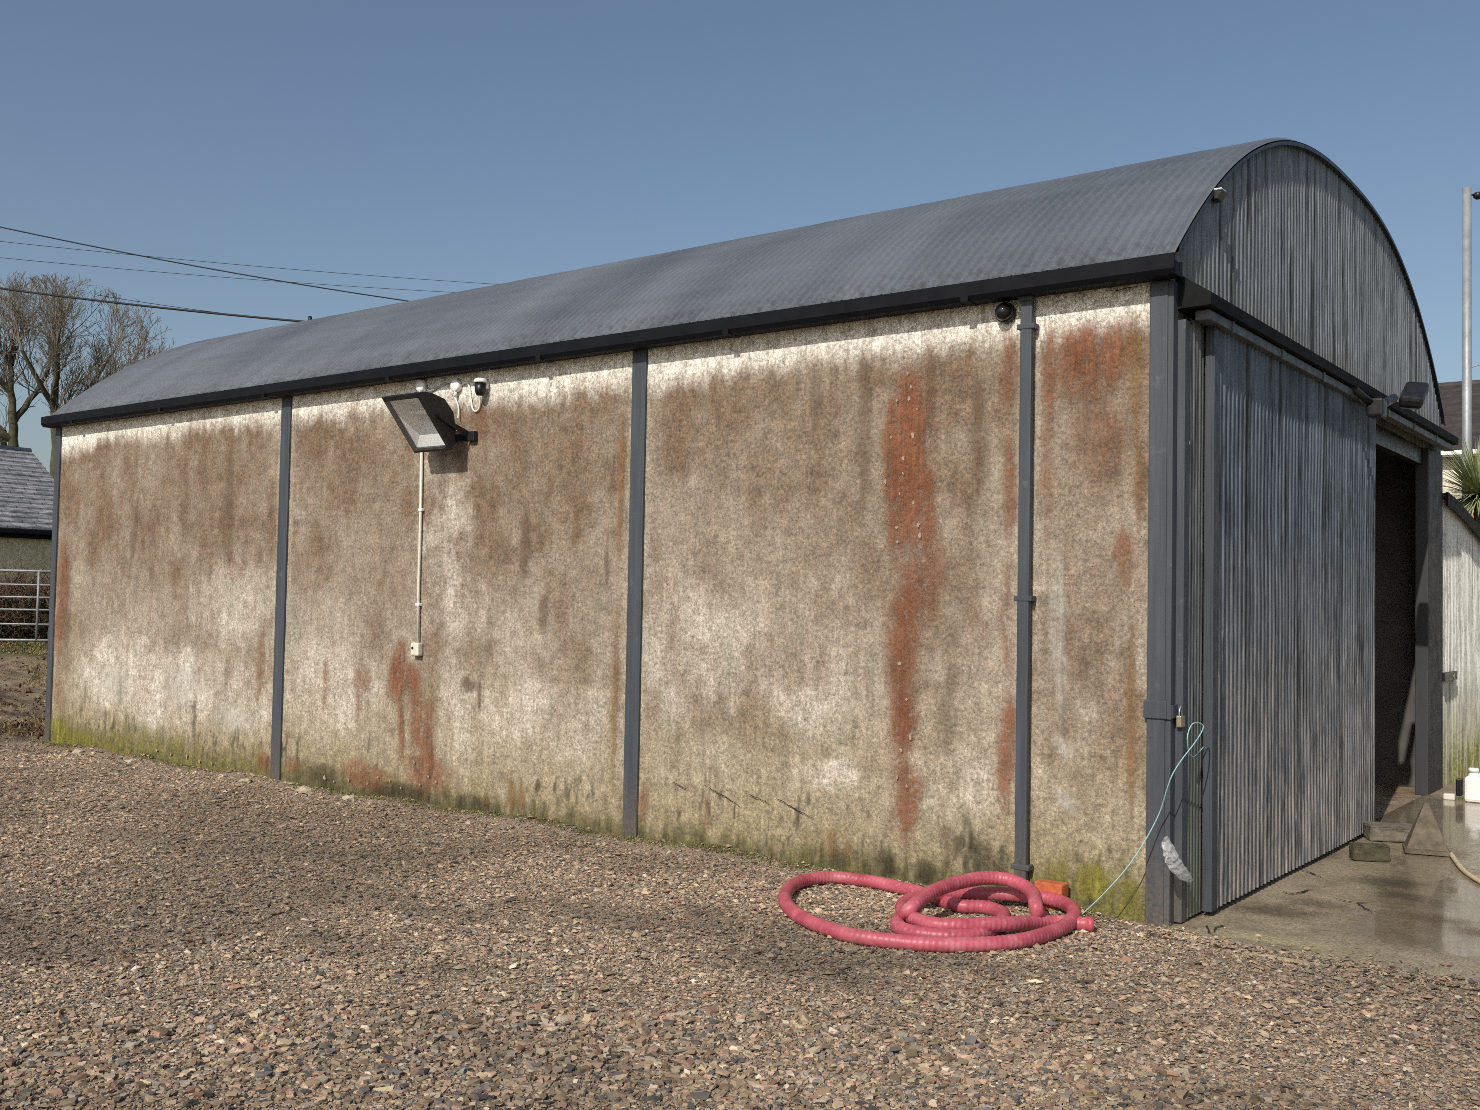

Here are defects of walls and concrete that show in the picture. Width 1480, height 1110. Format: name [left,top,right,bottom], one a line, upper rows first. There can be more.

rust [1042,324,1125,406]
rust [884,375,933,538]
rust [391,642,442,785]
rust [998,704,1016,802]